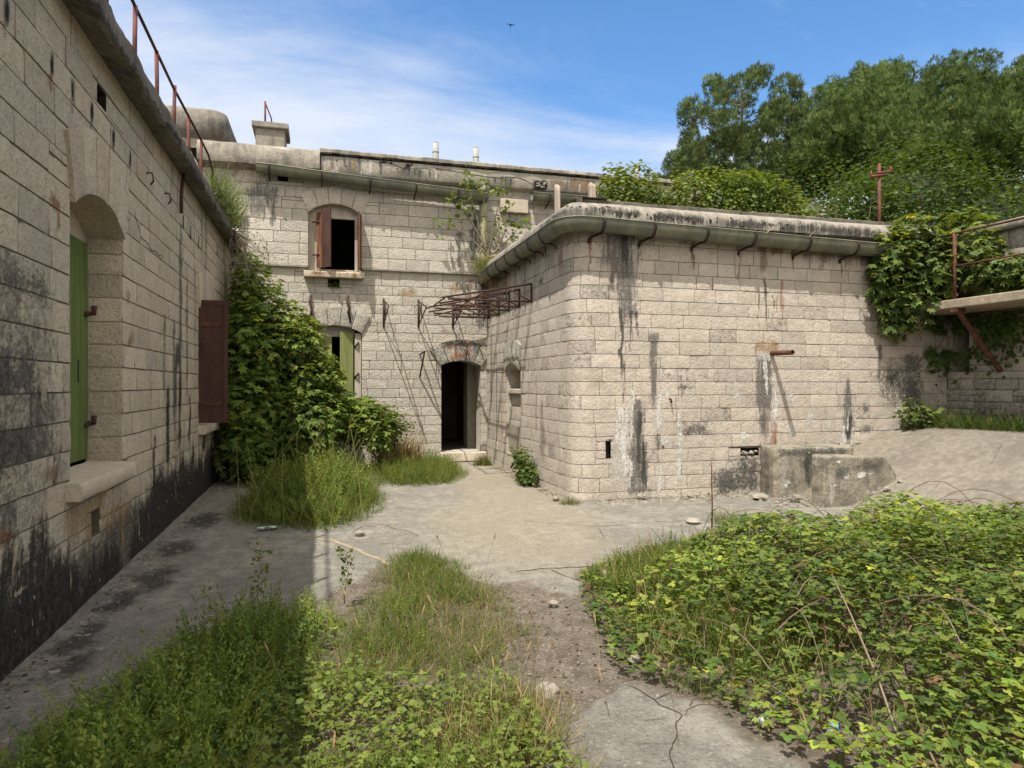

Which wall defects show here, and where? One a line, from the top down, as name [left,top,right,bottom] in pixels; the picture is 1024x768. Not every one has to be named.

leakage [0,224,230,682]
leakage [600,233,684,495]
leakage [739,353,813,445]
crack [622,683,725,768]